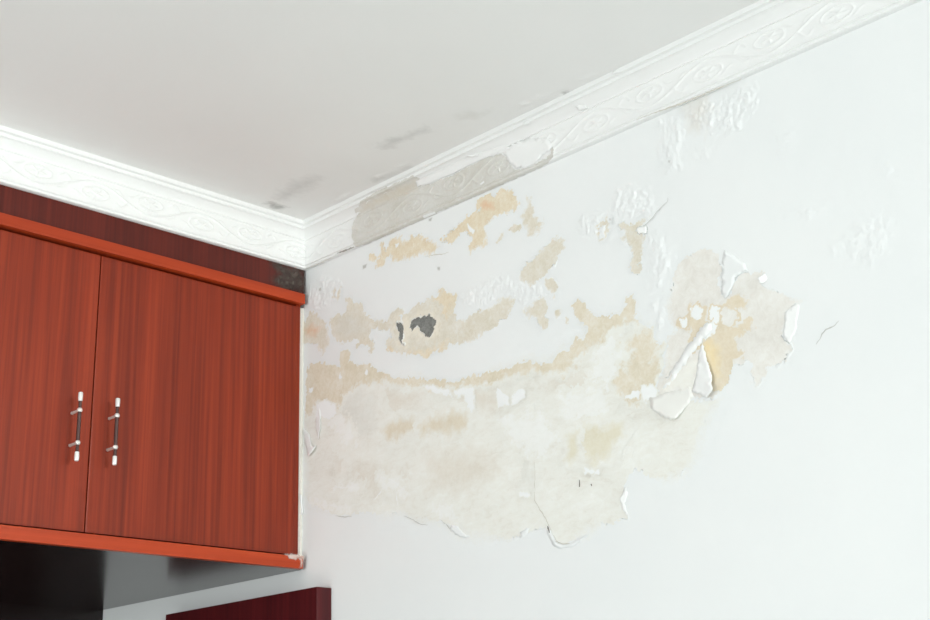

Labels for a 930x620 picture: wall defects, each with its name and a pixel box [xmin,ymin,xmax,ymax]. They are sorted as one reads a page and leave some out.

peeling [302,137,808,554]